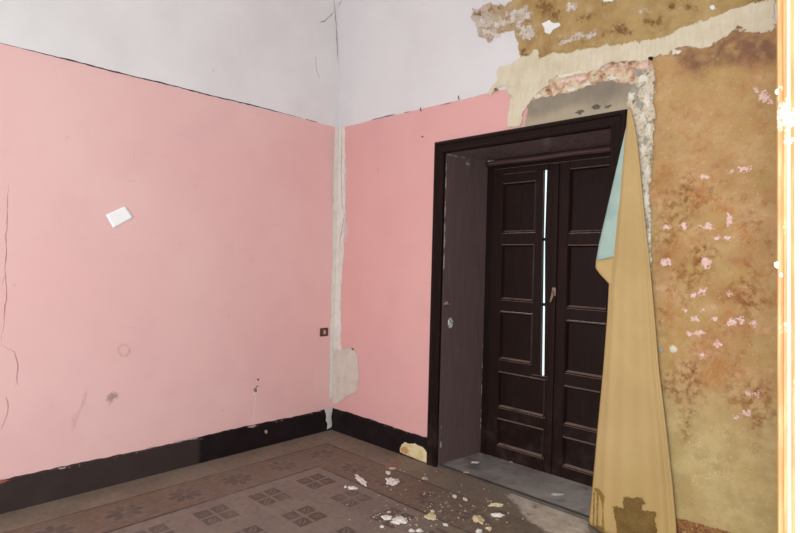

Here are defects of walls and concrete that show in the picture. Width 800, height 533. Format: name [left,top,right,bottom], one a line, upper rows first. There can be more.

spalling [470,0,777,59]
peeling [531,24,783,533]
spalling [400,442,427,463]